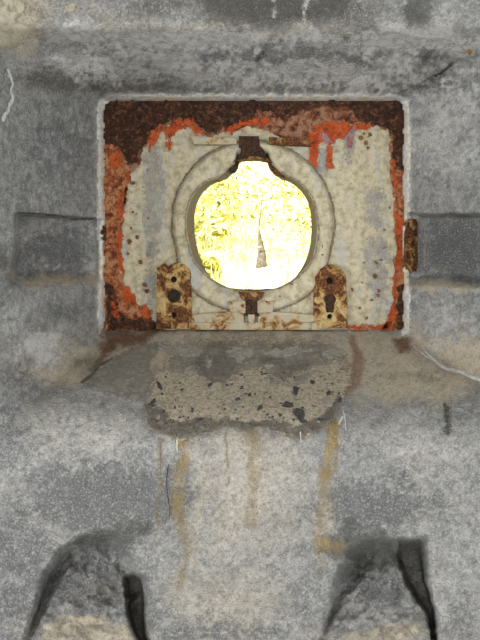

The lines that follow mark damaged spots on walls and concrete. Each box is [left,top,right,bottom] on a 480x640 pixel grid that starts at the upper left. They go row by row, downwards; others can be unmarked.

peeling [103,100,404,331]
spalling [81,330,354,442]